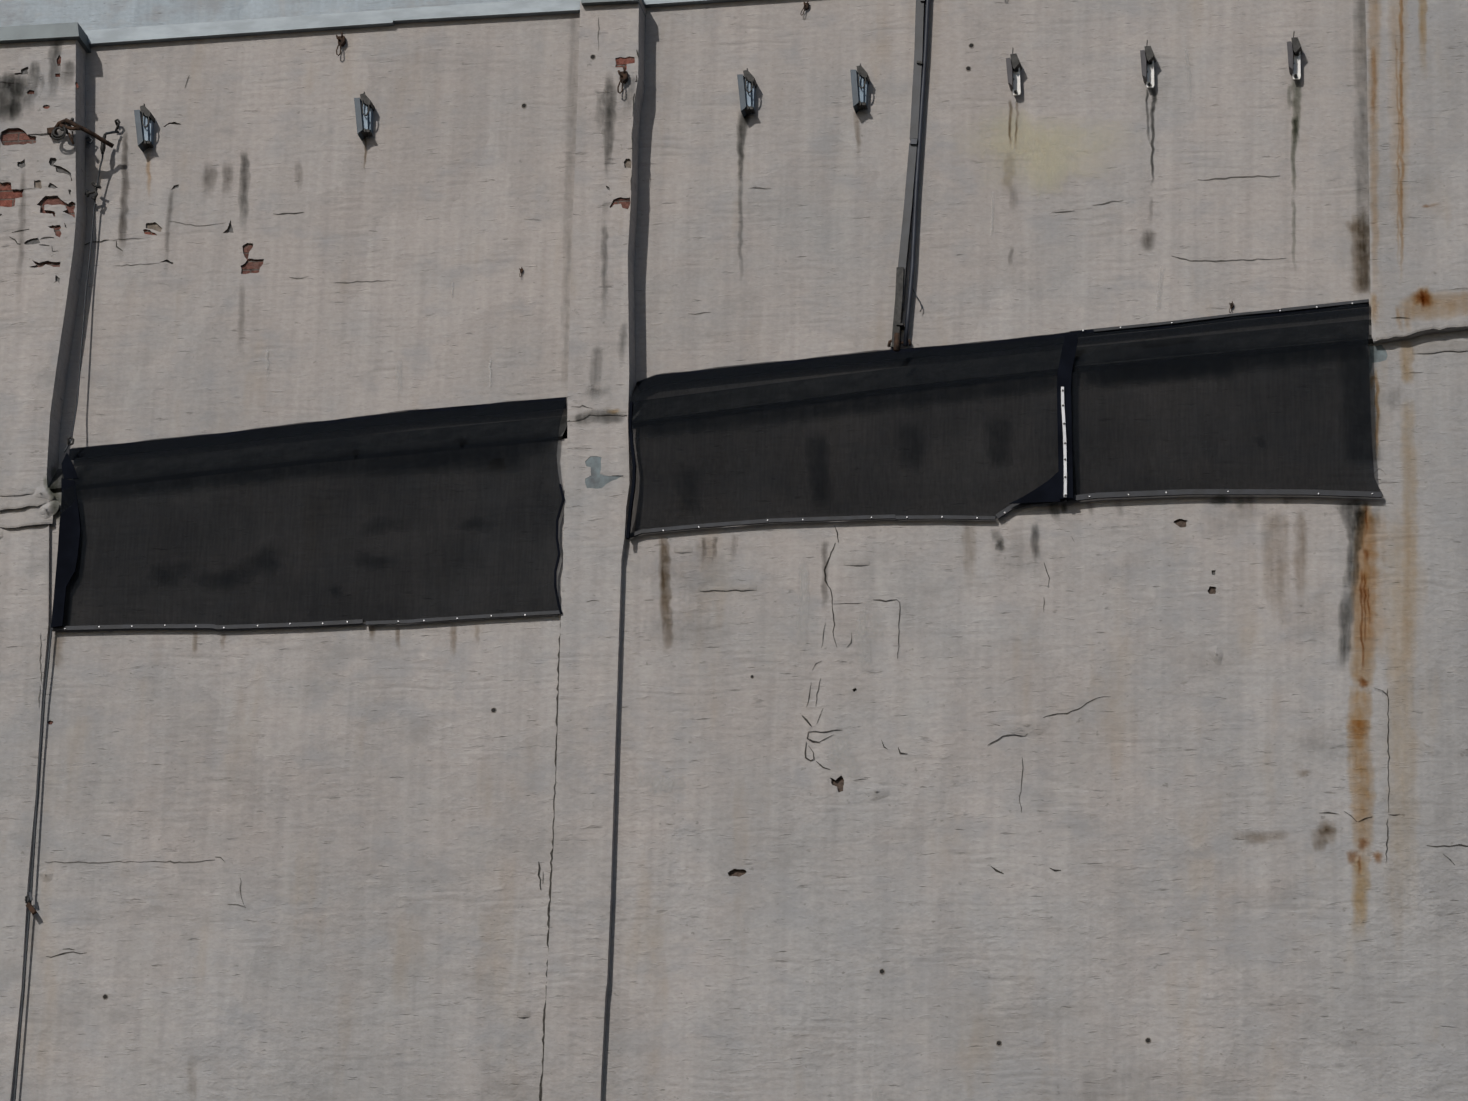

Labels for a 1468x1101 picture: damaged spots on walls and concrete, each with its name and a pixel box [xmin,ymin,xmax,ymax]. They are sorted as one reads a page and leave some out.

spalling [0,128,75,284]
water stain [738,115,748,161]
crack [802,525,907,797]
crack [988,696,1108,811]